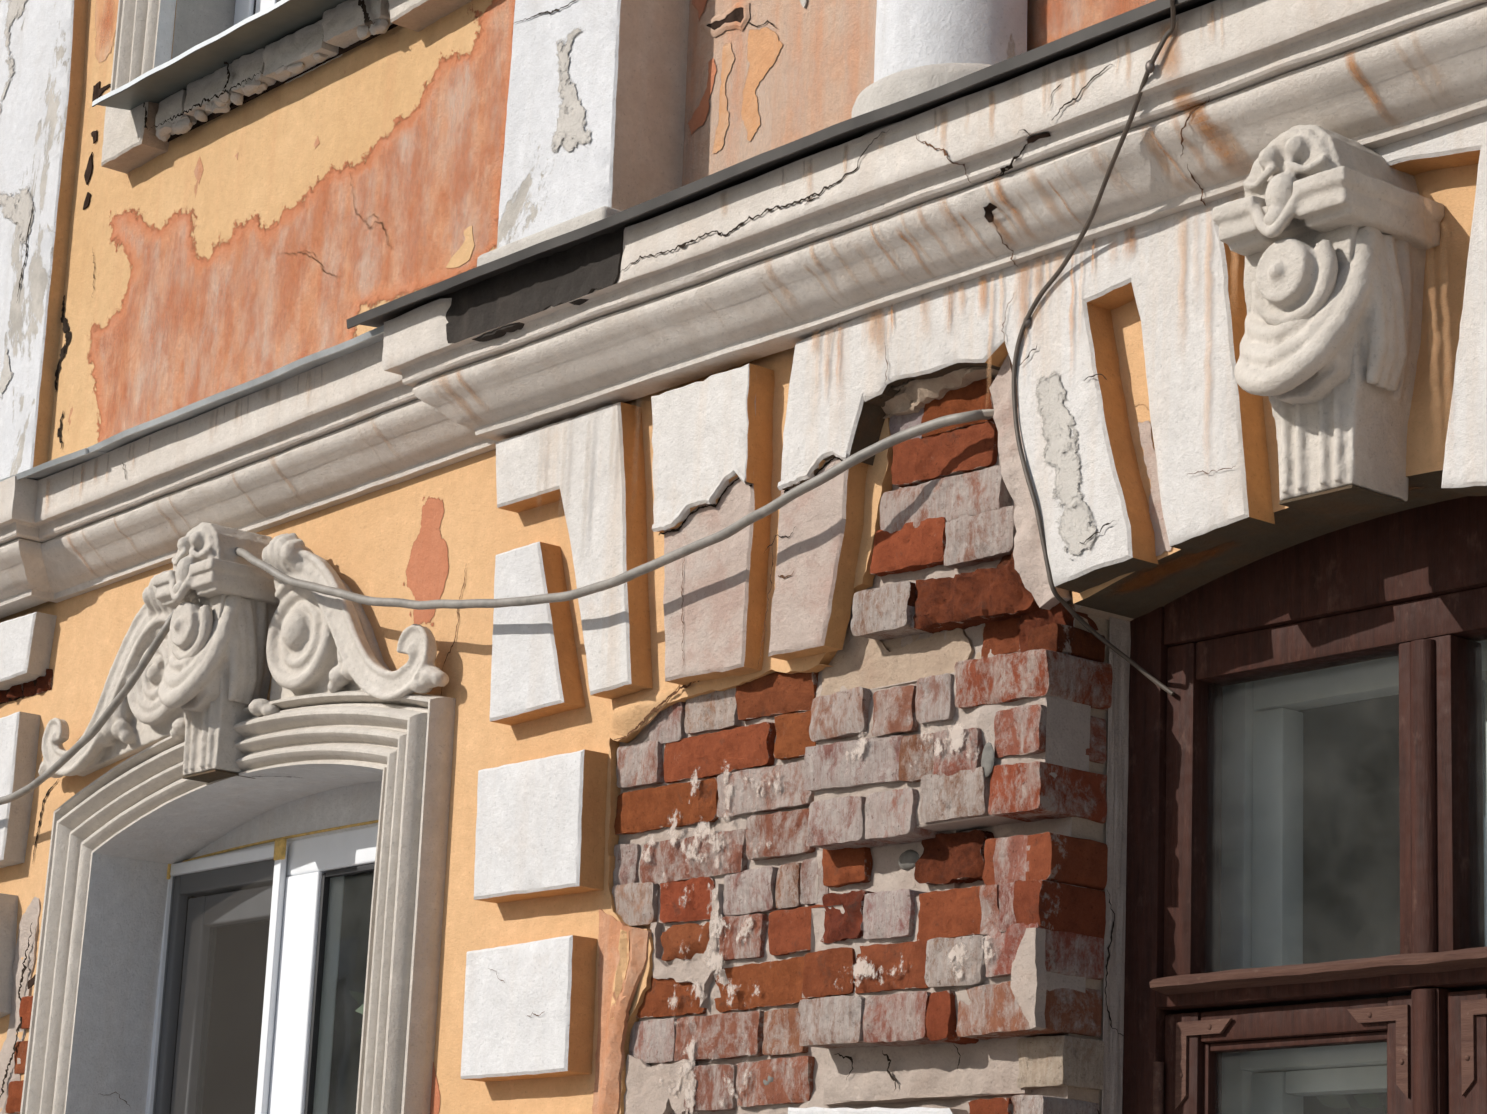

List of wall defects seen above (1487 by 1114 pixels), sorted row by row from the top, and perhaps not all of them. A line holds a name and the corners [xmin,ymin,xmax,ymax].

peeling [0,0,27,112]
spalling [83,130,98,210]
peeling [87,0,628,443]
peeling [682,0,877,186]
crack [613,64,1113,283]
crack [1180,98,1210,206]
rust [1348,60,1379,104]
crack [55,251,95,448]
peeling [403,496,449,626]
spalling [0,669,53,704]
spalling [592,354,1113,1114]
spalling [0,897,41,1114]